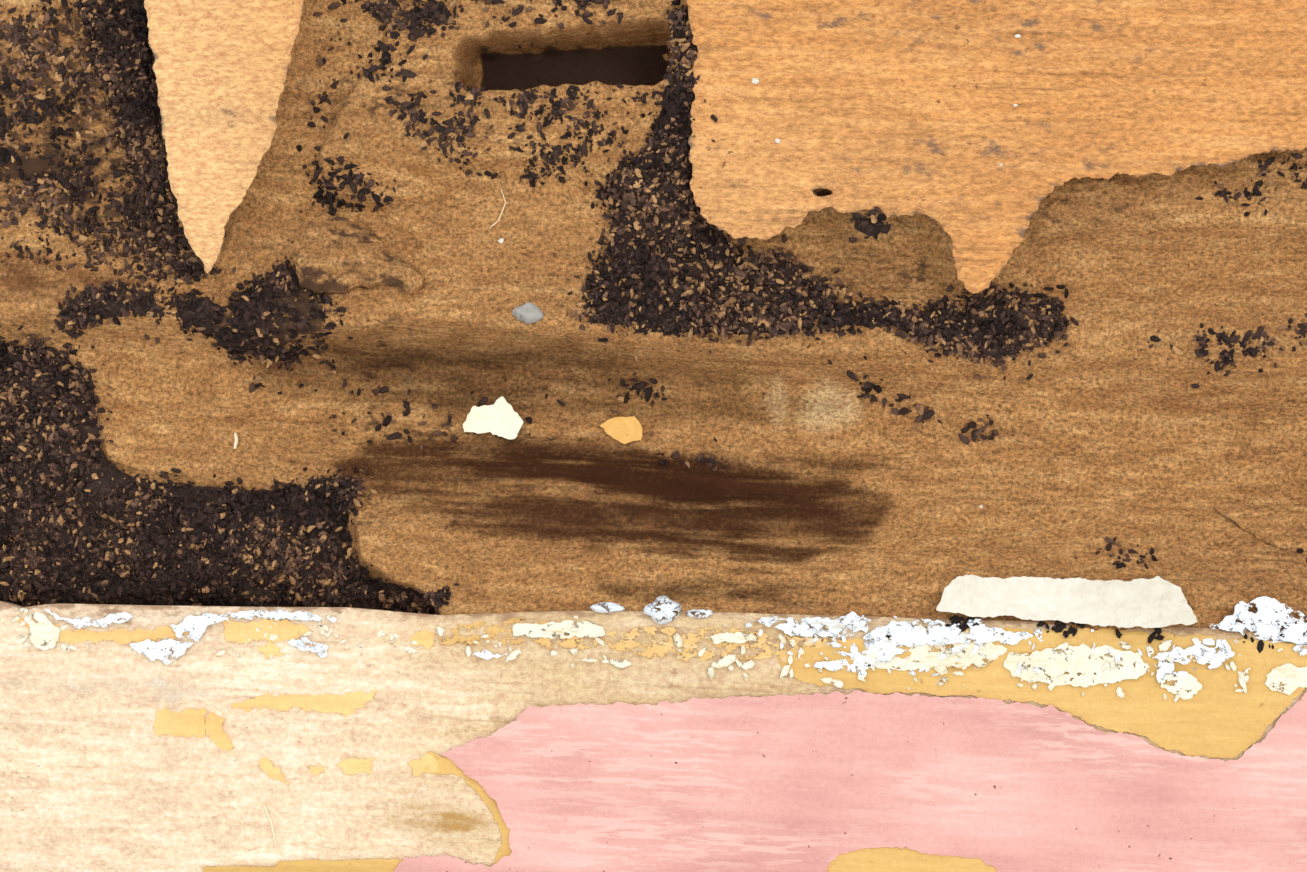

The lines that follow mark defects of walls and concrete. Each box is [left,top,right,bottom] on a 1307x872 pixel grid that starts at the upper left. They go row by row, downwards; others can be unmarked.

peeling [599,416,643,444]
damp [336,439,886,562]
peeling [12,575,1307,758]
peeling [258,757,289,785]
peeling [309,757,374,775]
peeling [408,751,512,864]
peeling [204,858,403,872]
peeling [827,847,998,872]